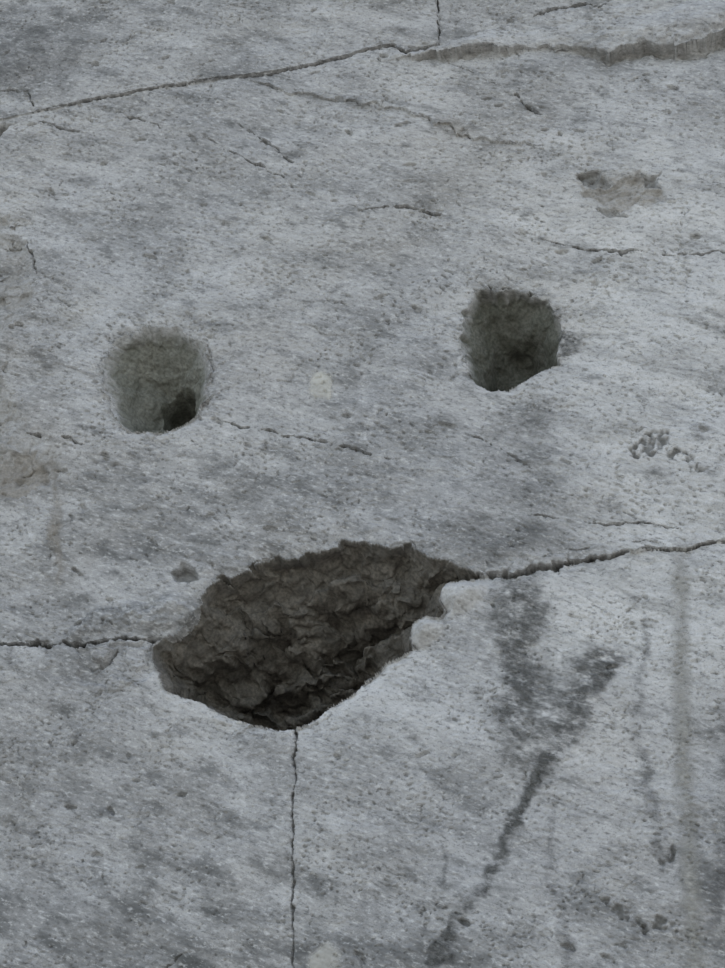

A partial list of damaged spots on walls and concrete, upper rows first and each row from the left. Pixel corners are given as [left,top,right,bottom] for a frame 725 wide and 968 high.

crack [0,0,564,160]
crack [522,2,607,23]
crack [200,119,301,185]
crack [0,635,162,649]
spalling [72,538,492,732]
crack [290,728,299,968]
damp [484,754,553,892]
damp [425,903,472,968]